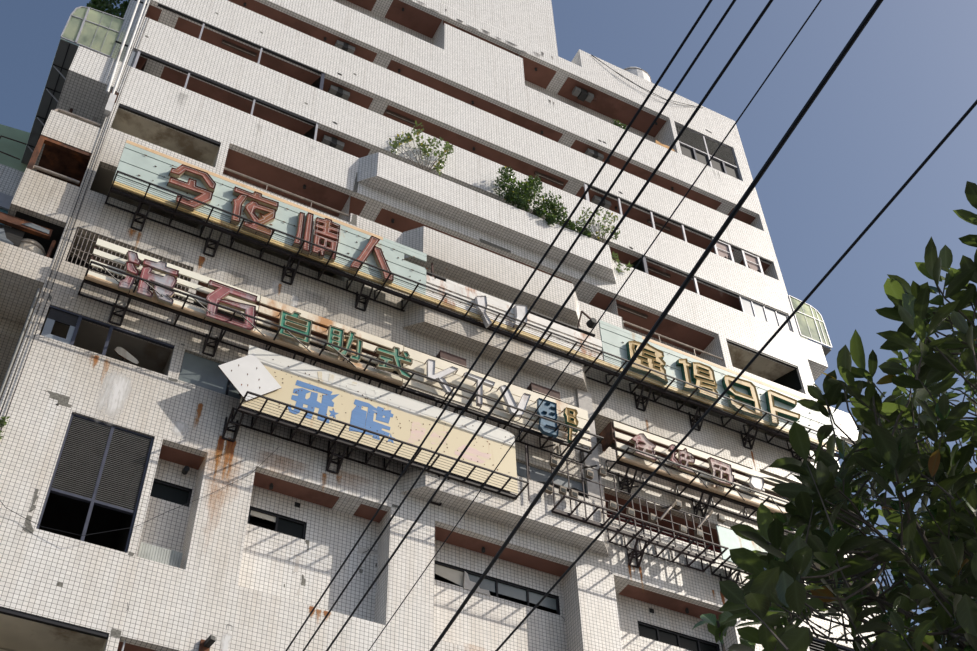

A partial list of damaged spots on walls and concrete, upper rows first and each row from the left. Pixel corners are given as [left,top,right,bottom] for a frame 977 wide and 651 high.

peeling [45,390,72,408]
water stain [99,374,131,414]
rust [215,435,236,476]